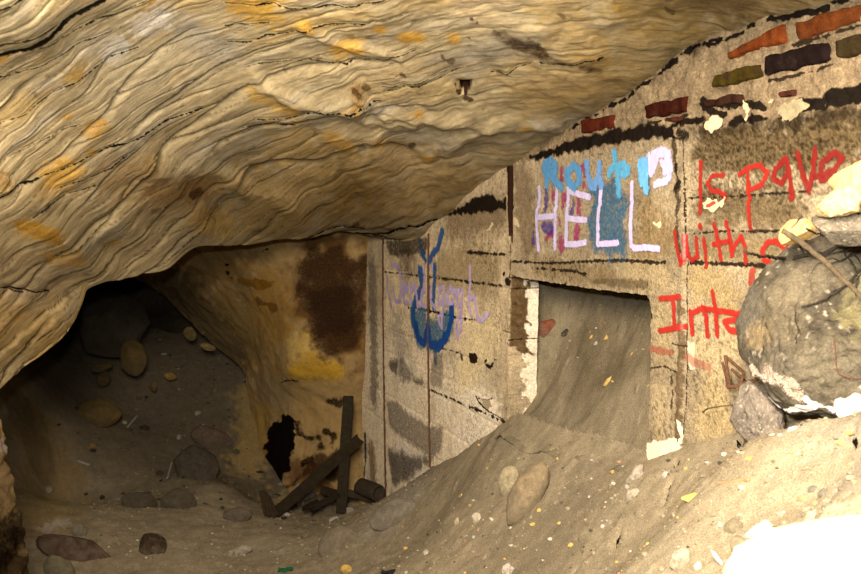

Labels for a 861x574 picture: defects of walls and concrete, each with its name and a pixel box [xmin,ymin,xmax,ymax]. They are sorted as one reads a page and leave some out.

leakage [388,356,442,388]
leakage [388,402,443,492]